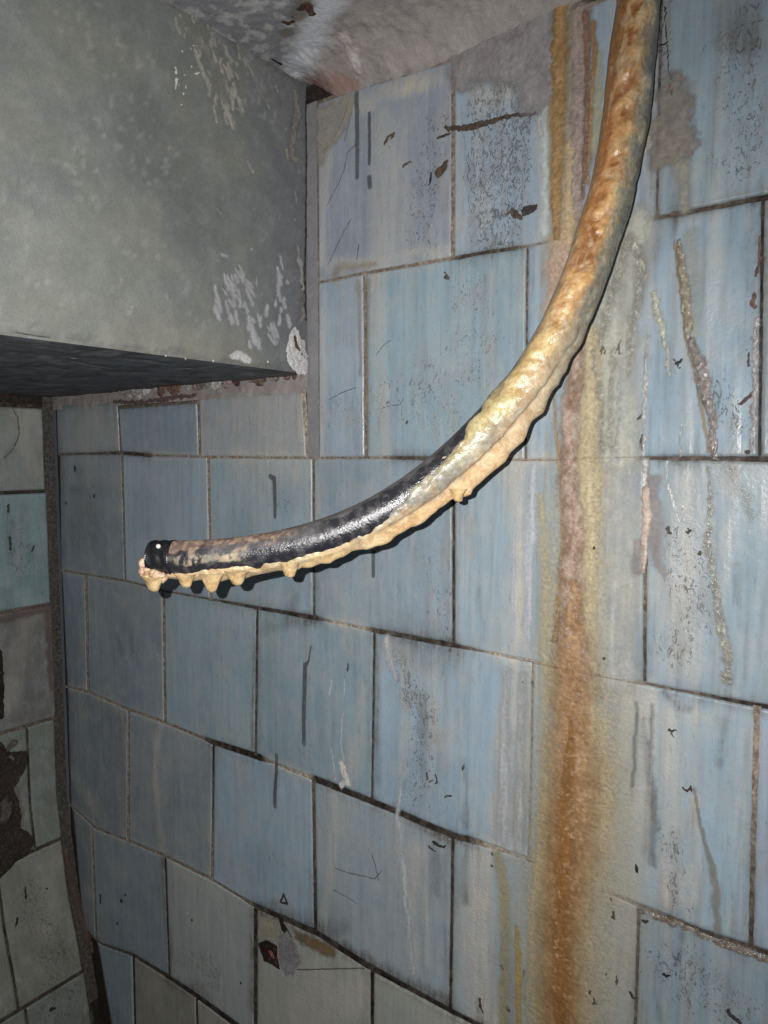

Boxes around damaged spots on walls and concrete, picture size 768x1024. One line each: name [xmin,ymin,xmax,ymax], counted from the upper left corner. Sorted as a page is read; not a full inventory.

rust [544,2,603,311]
peeling [110,245,309,405]
leakage [167,0,684,690]
leakage [673,233,732,684]
spalling [0,740,33,878]
spalling [258,916,335,975]
rust [495,316,644,1024]